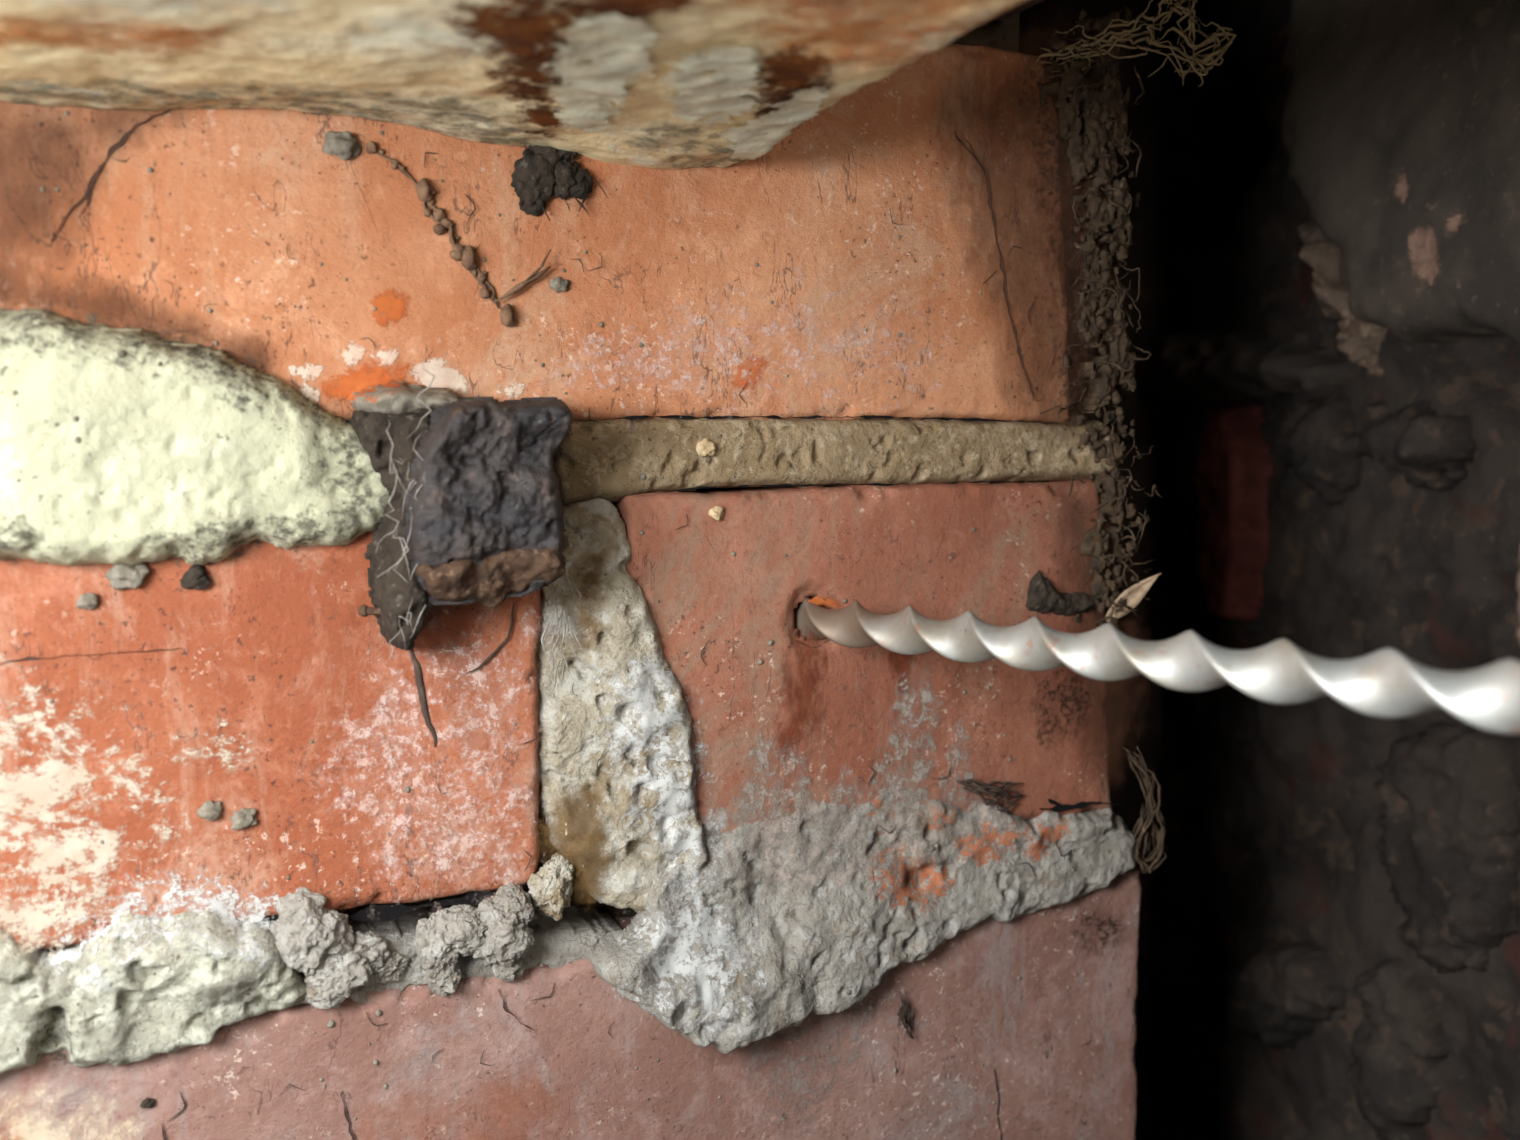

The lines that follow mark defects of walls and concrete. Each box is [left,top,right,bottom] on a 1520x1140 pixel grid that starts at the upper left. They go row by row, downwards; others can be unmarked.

crack [51,109,171,242]
rust [442,0,693,138]
rust [752,44,835,119]
crack [573,132,1062,424]
rust [364,412,566,651]
water stain [0,685,278,990]
water stain [329,641,532,898]
crack [340,1092,356,1140]